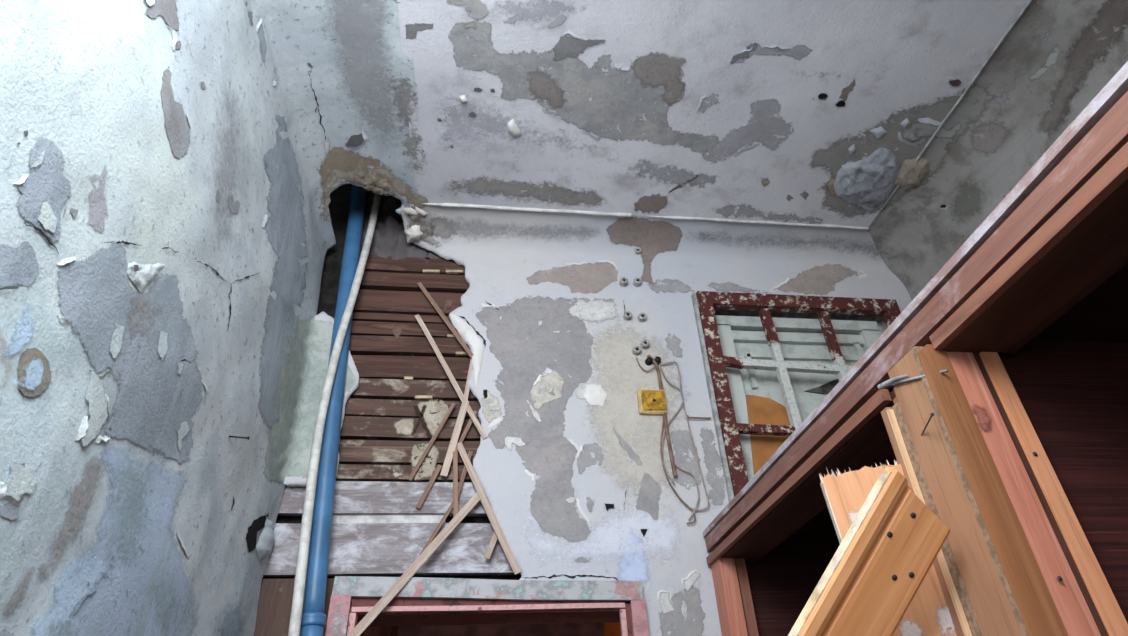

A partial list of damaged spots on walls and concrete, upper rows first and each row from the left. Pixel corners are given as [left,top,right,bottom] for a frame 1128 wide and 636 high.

crack [308,73,326,141]
peeling [446,0,793,163]
peeling [735,42,811,63]
peeling [869,118,962,146]
leakage [1040,0,1128,132]
peeling [13,130,78,244]
flaking render [343,169,441,247]
crack [104,241,259,331]
peeling [648,279,693,293]
peeling [709,263,867,295]
peeling [31,243,208,636]
peeling [450,260,618,542]